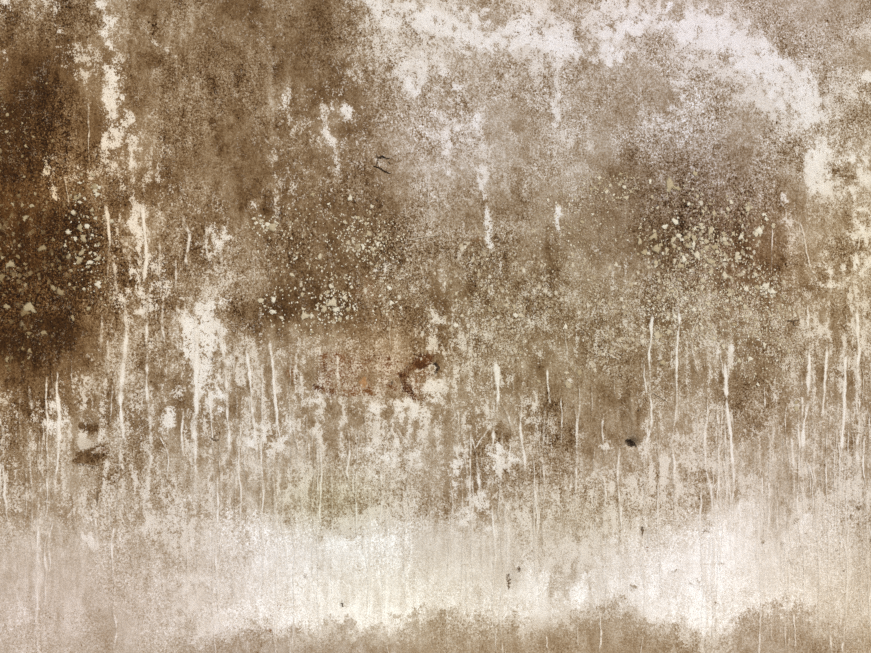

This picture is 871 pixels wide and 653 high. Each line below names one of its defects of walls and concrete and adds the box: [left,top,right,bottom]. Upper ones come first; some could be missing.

efflorescence [317,99,355,173]
crack [373,153,390,174]
water stain [361,0,871,299]
water stain [0,410,43,653]
water stain [33,362,124,653]
efflorescence [139,200,165,301]
efflorescence [146,259,179,356]
efflorescence [187,312,206,512]
water stain [219,319,238,490]
corrosion [309,346,440,404]
water stain [359,377,448,485]
water stain [804,305,871,653]